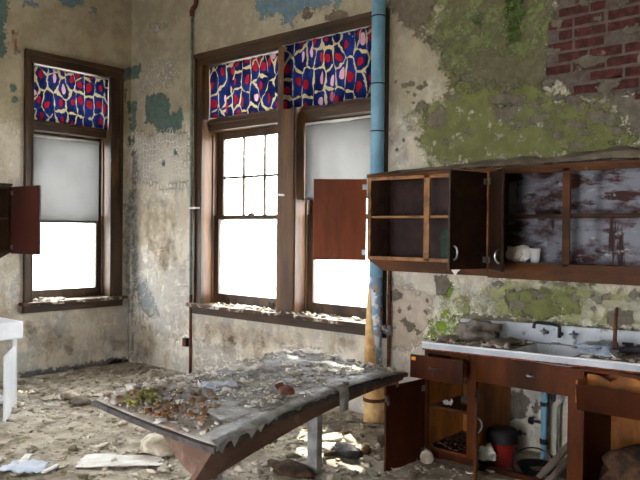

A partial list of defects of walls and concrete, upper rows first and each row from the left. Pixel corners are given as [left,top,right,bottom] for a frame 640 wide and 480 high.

peeling [0,0,21,58]
peeling [253,0,348,29]
peeling [124,63,184,155]
flaking render [395,81,447,130]
flaking render [430,0,640,155]
flaking render [386,274,451,352]